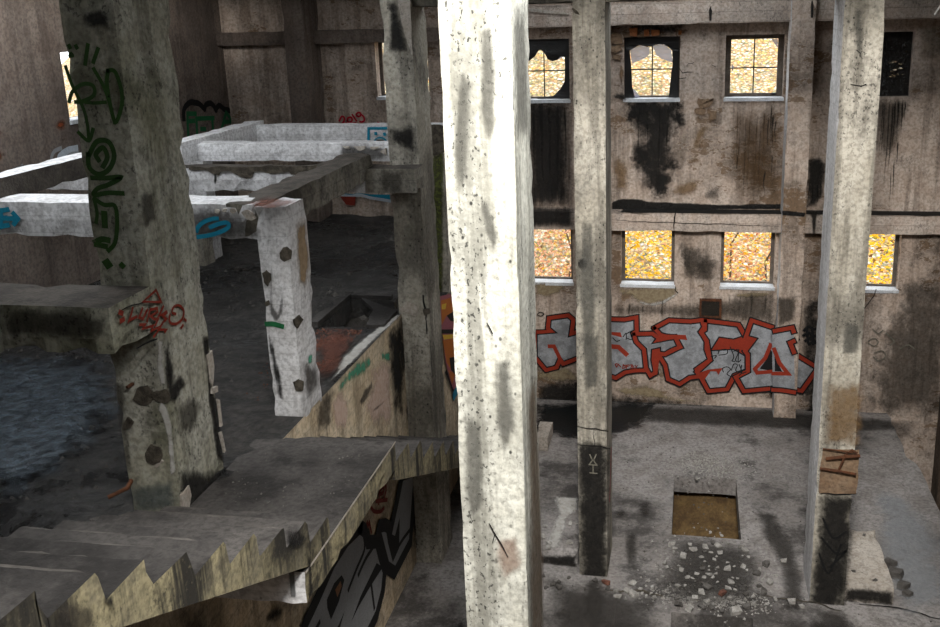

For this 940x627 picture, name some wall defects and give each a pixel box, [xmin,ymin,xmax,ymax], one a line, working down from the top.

damp [678,182,696,194]
damp [880,102,906,199]
damp [529,226,597,627]